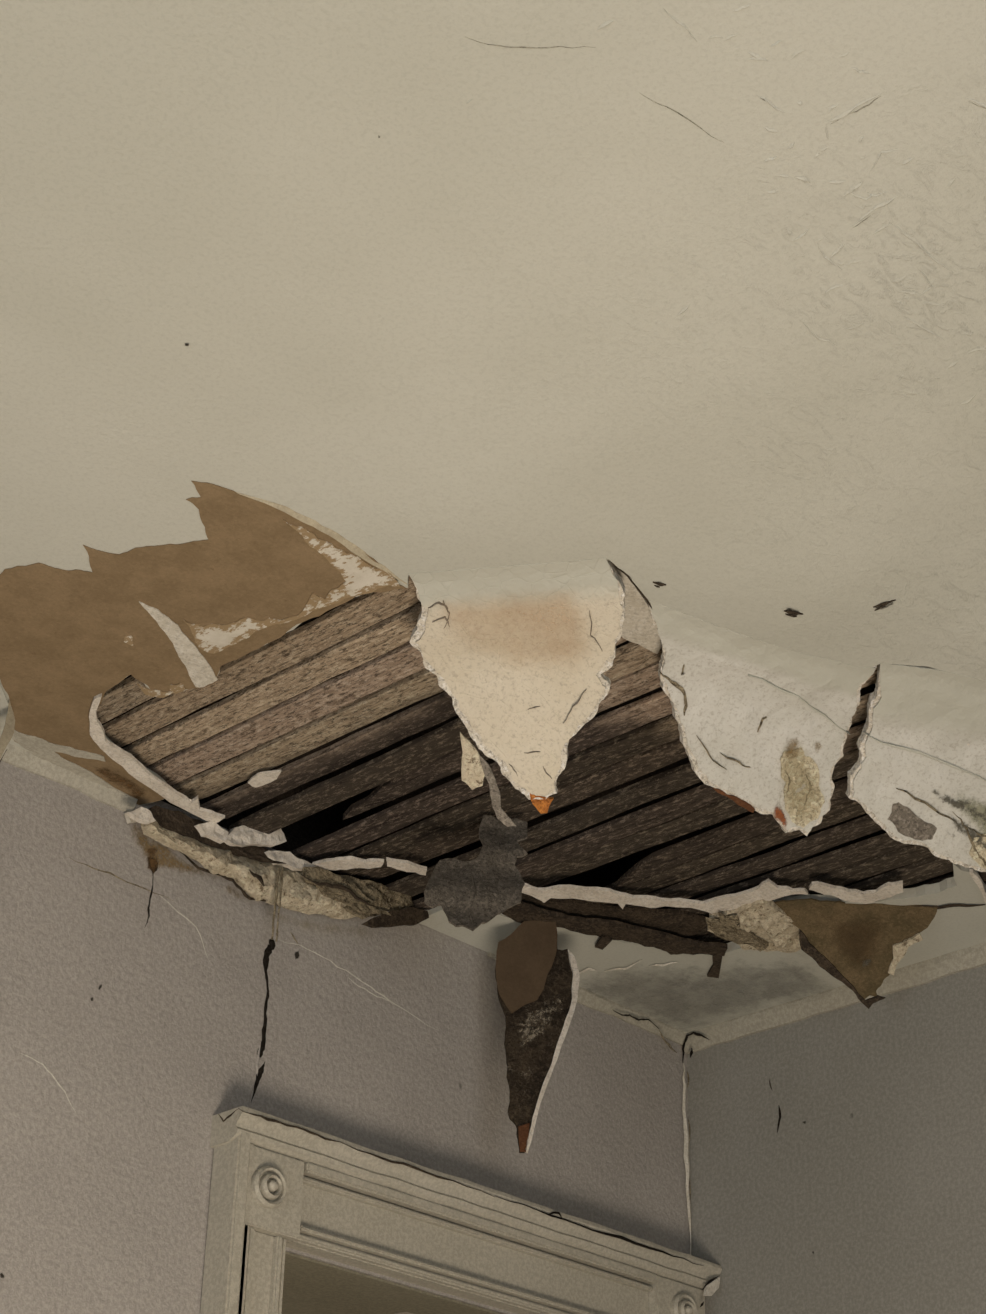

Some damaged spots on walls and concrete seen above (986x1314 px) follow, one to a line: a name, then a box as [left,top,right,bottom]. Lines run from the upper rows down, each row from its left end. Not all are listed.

spalling [609,560,666,654]
peeling [0,481,414,919]
crack [659,665,751,770]
crack [748,674,986,781]
crack [784,773,811,805]
peeling [888,802,937,841]
crack [896,788,986,866]
spalling [706,899,801,953]
spalling [969,869,986,903]
crack [218,867,709,1266]